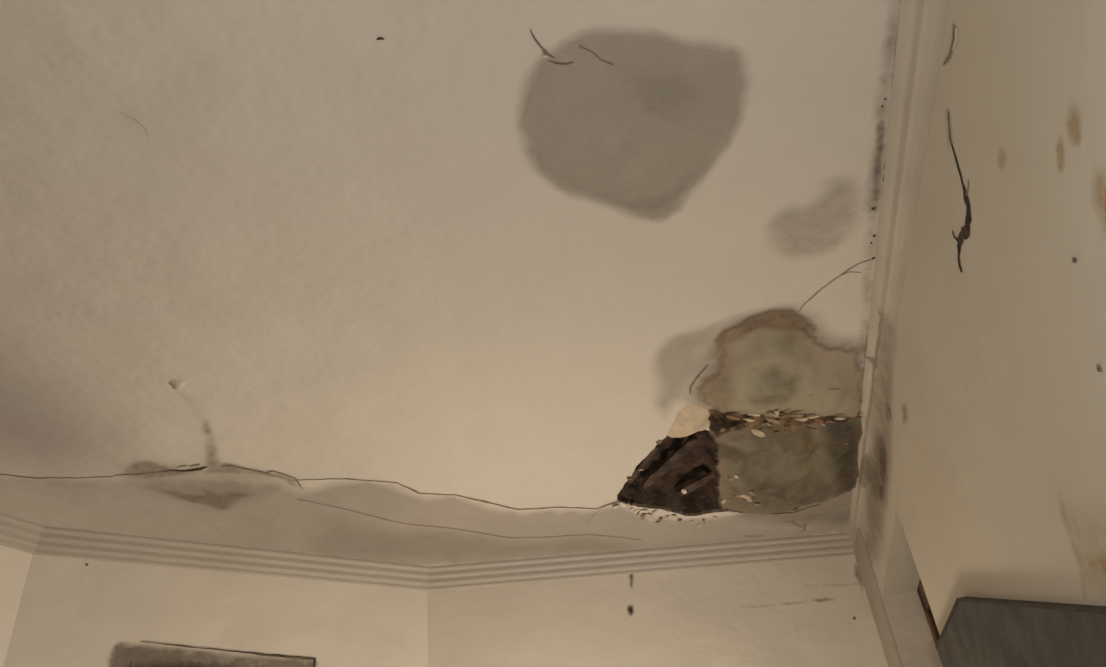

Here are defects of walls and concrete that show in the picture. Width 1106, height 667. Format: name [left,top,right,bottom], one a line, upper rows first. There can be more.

water stain [524,36,741,219]
crack [948,111,971,272]
spalling [613,405,862,518]